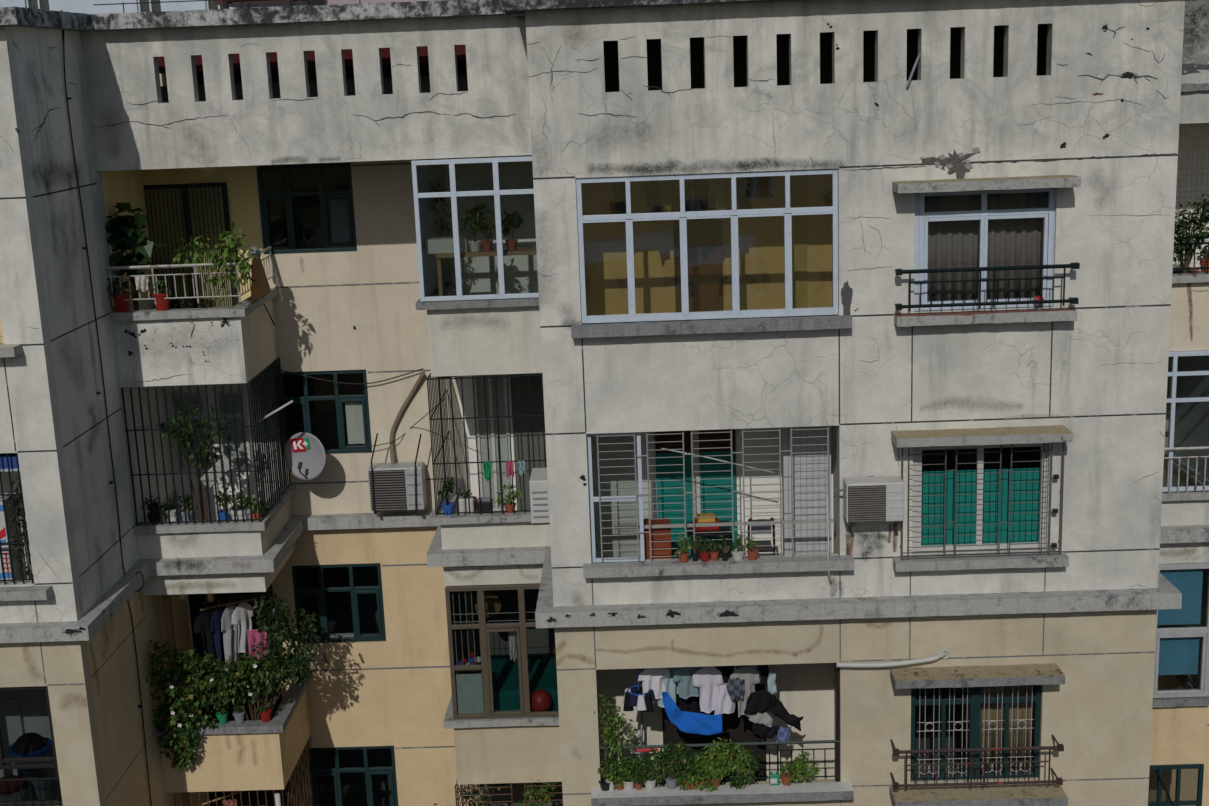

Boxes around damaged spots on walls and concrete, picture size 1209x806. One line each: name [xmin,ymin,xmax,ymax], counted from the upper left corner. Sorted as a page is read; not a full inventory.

crack [0,60,109,151]
crack [96,100,249,149]
crack [348,92,515,154]
crack [530,36,694,150]
crack [853,164,924,172]
spalling [920,147,981,179]